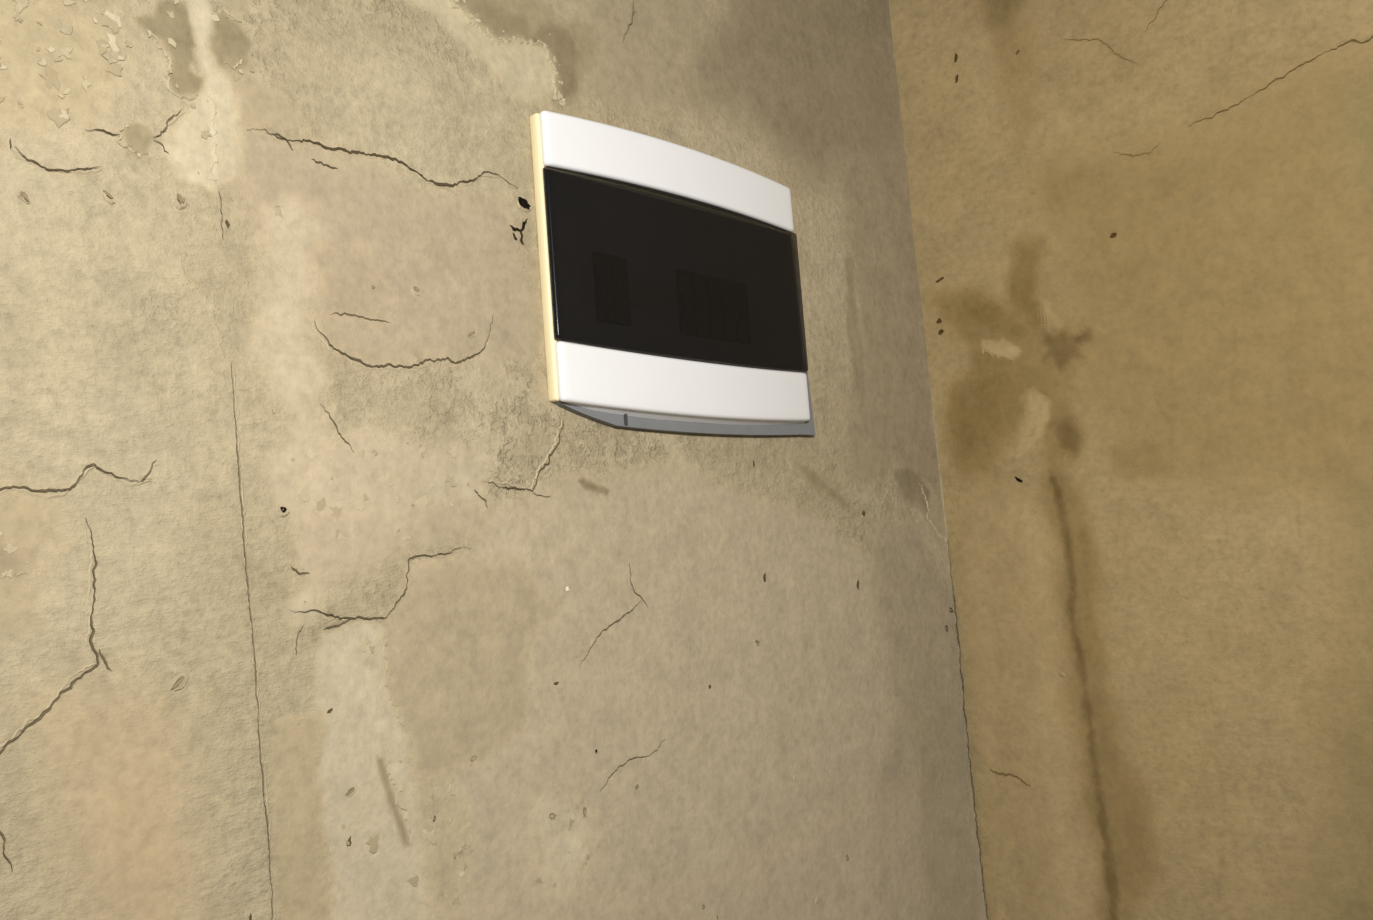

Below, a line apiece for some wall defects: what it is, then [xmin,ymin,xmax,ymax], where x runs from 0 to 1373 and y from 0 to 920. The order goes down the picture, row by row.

crack [1188,35,1373,127]
crack [246,128,528,244]
crack [311,312,494,371]
crack [475,420,564,506]
leakage [459,0,1373,920]
crack [0,460,156,753]
crack [289,547,470,655]
crack [0,831,13,871]